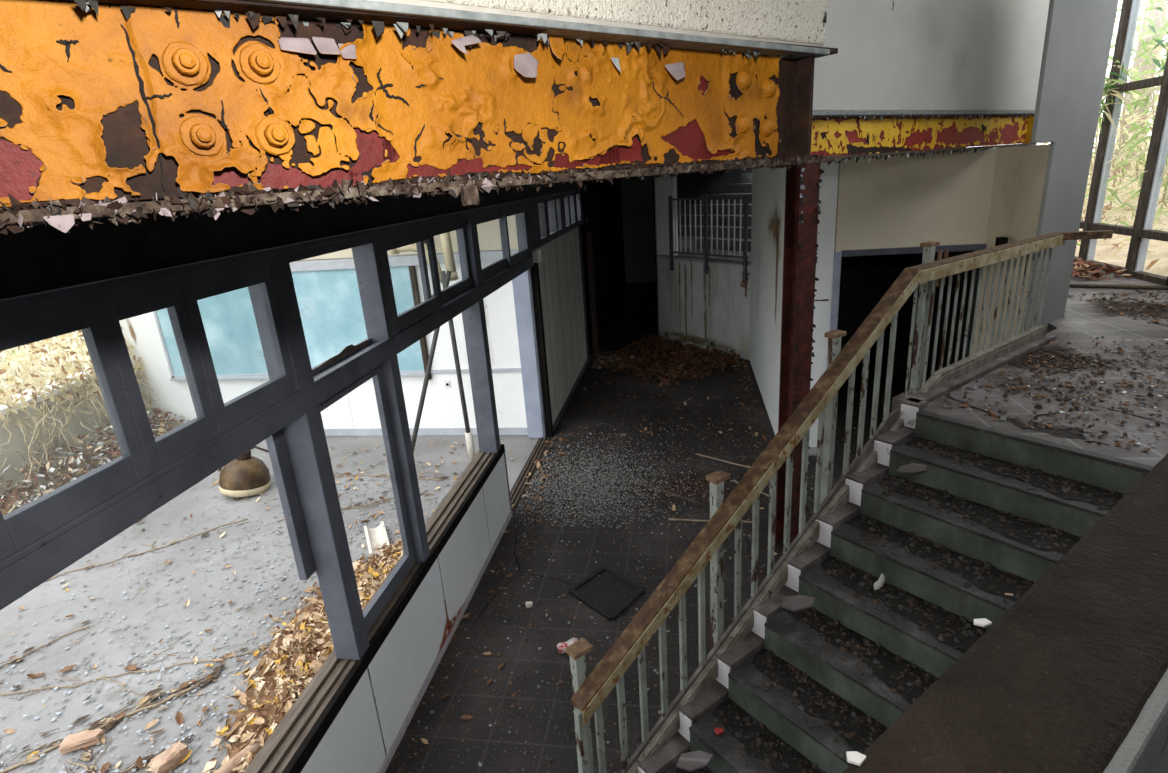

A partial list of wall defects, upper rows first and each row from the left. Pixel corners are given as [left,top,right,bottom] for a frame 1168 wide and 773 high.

peeling [274,17,373,103]
peeling [409,27,433,52]
peeling [451,30,566,78]
peeling [665,62,686,81]
peeling [698,76,709,96]
peeling [728,73,743,101]
peeling [753,56,796,158]
peeling [0,90,47,204]
peeling [70,101,156,195]
peeling [661,116,738,161]
peeling [845,122,1021,155]